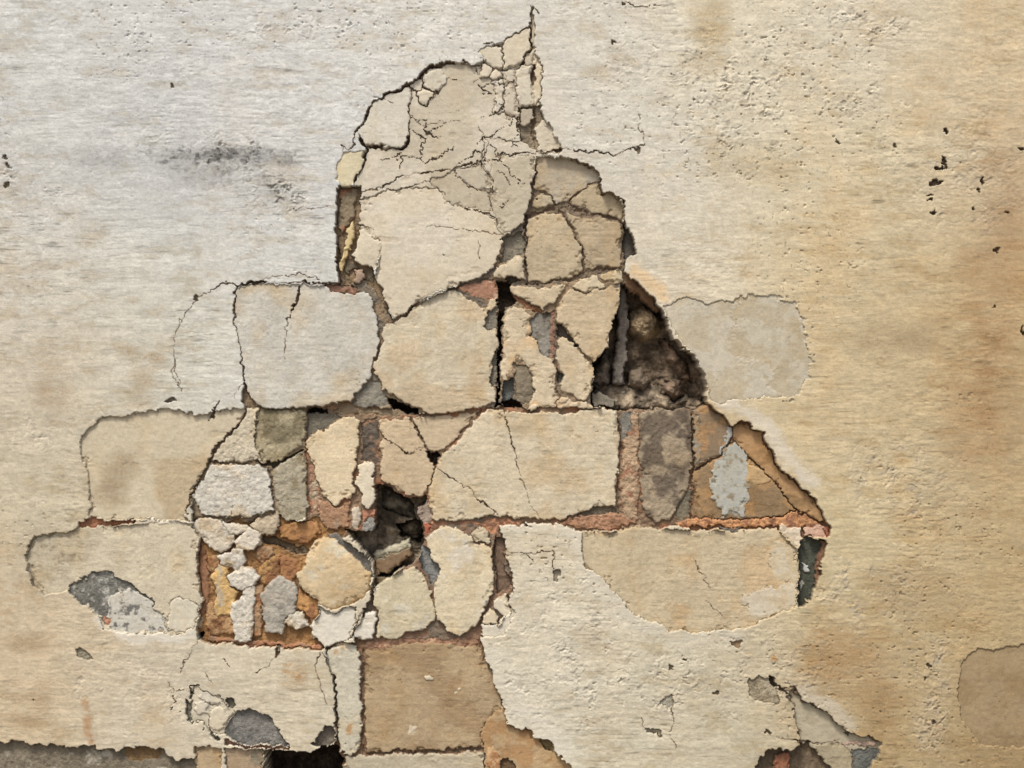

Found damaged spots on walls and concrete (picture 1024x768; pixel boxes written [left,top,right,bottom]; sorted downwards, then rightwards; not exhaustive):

crack [340,5,645,377]
crack [170,224,374,524]
spalling [0,15,830,768]
crack [552,312,561,407]
crack [615,413,625,512]
crack [314,578,484,757]
spalling [748,675,880,768]